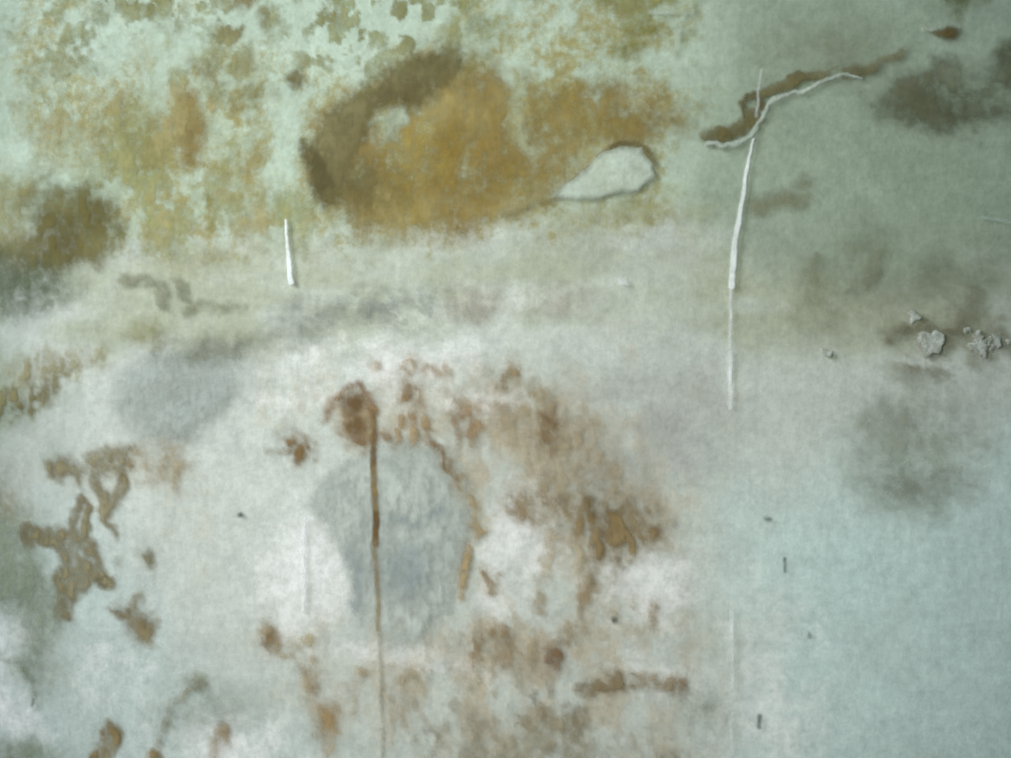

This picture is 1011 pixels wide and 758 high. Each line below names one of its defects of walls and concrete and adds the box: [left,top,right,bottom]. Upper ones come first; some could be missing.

leakage [212,25,260,98]
leakage [302,0,671,236]
crack [700,49,903,148]
leakage [882,46,1011,130]
leakage [0,71,219,314]
flaking render [554,141,656,200]
leakage [0,358,78,416]
rust [326,382,429,559]
peeling [21,447,133,620]
rust [459,495,484,599]
rust [260,626,285,657]
rust [216,724,228,741]